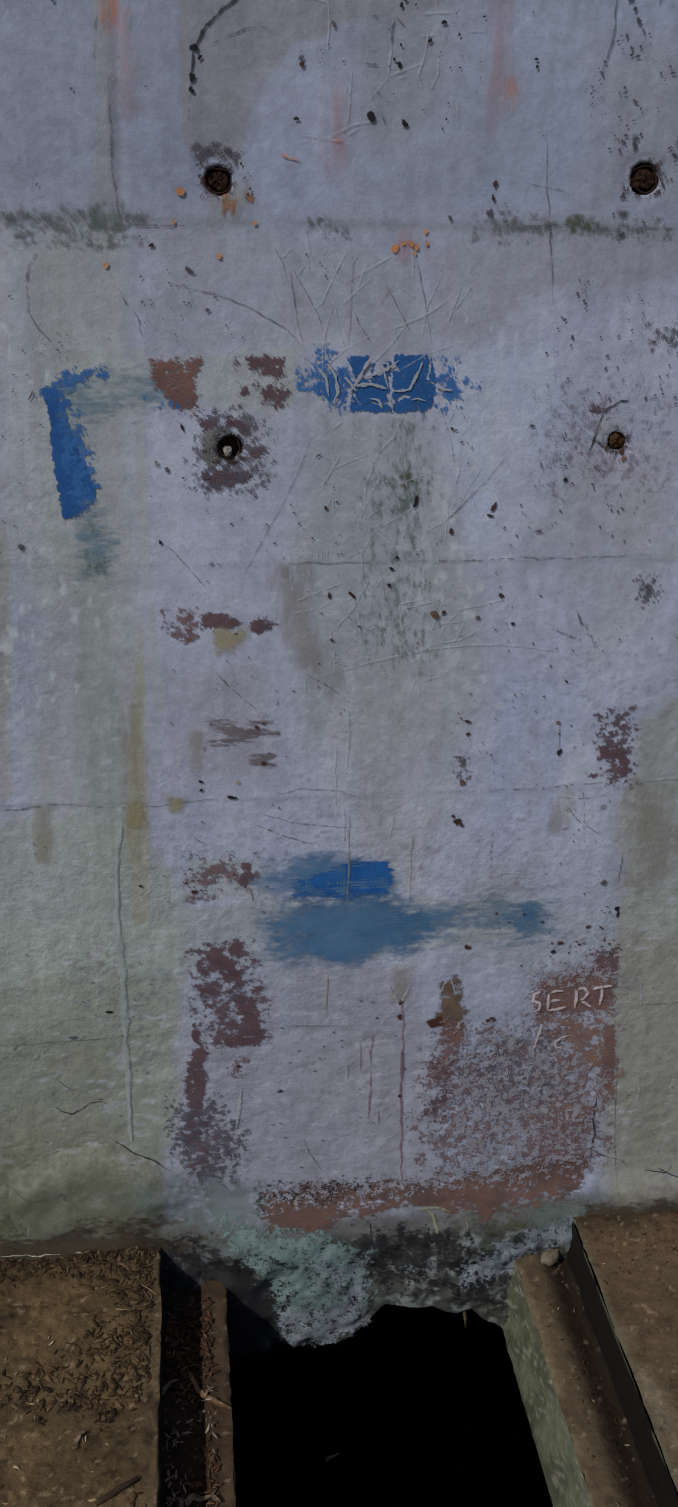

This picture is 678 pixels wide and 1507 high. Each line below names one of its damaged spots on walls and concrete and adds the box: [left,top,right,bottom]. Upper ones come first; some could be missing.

corrosion [200,161,253,214]
water stain [0,1178,678,1368]
spalling [158,1221,678,1507]